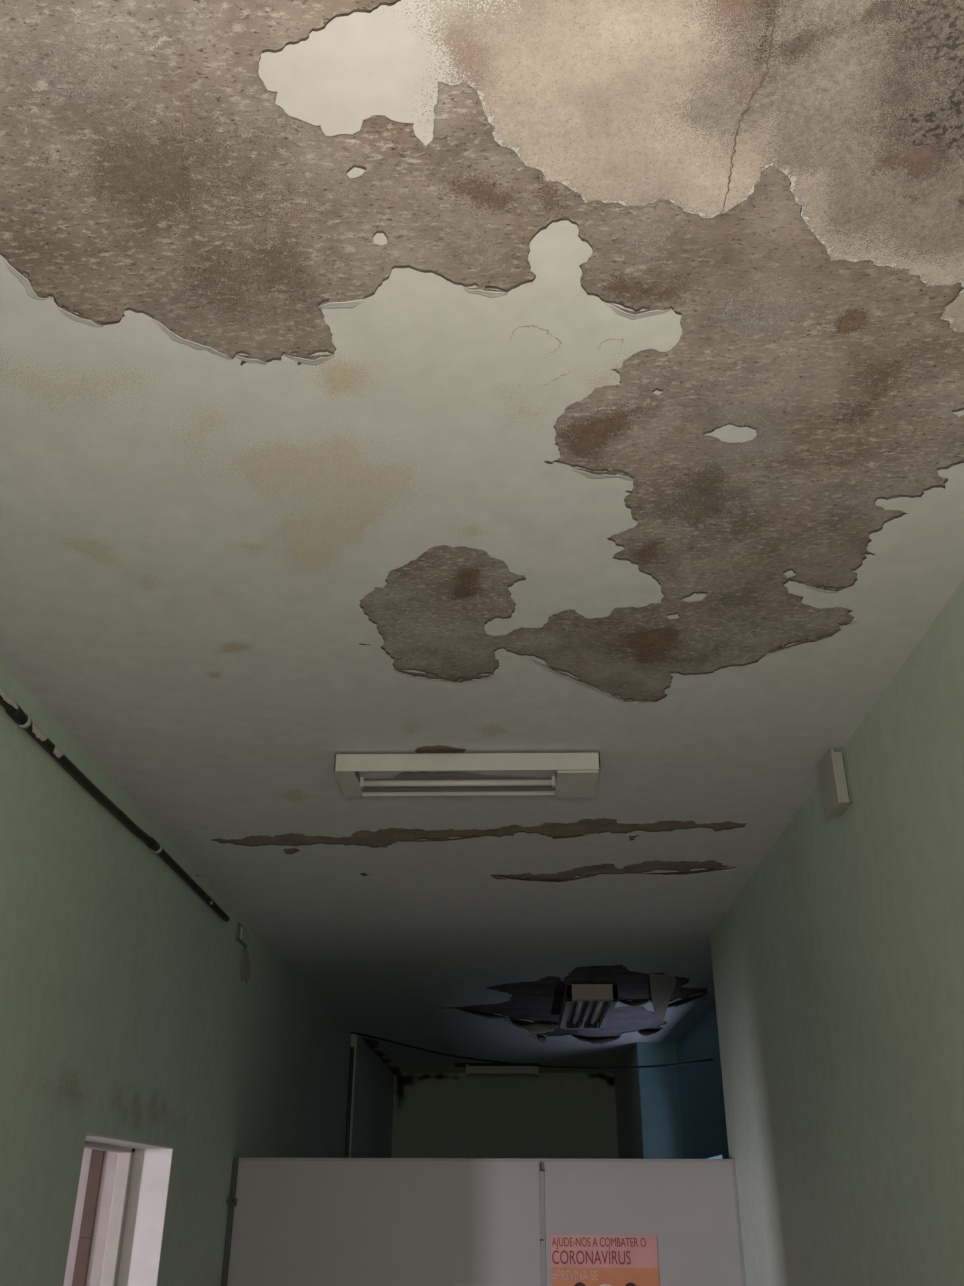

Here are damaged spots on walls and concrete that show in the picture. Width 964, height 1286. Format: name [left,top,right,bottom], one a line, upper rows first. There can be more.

crack [720,0,777,216]
water stain [408,0,964,343]
peeling [0,0,964,703]
peeling [0,687,18,709]
peeling [32,723,63,758]
peeling [212,818,747,854]
peeling [491,860,737,883]
peeling [448,964,712,1045]